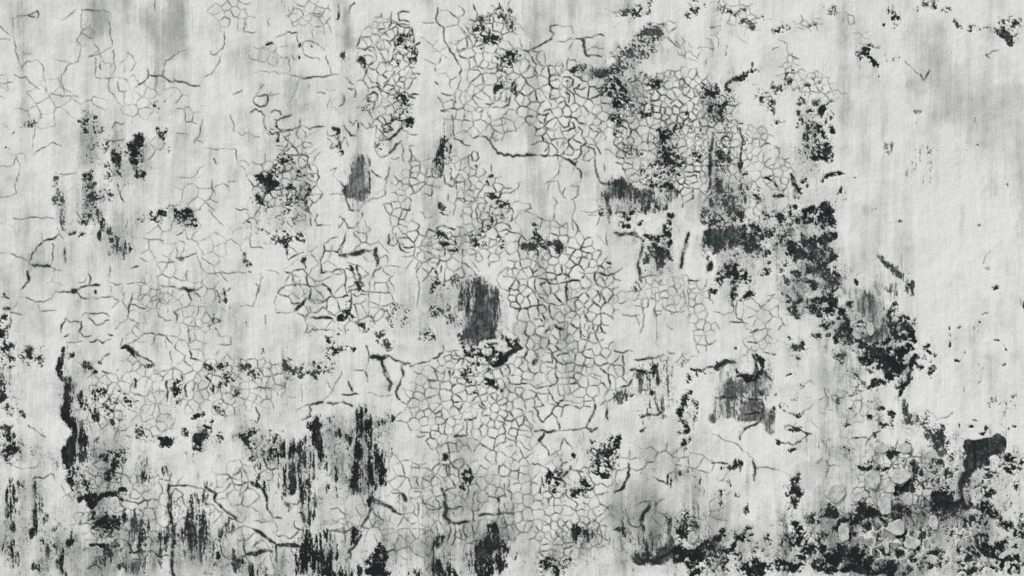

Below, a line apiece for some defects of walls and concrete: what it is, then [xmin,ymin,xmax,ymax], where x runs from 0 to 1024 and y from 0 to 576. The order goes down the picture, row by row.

peeling [472,9,521,97]
peeling [68,110,147,259]
peeling [138,205,198,228]
peeling [247,119,314,251]
damp [342,155,371,201]
peeling [569,0,794,307]
crack [3,0,797,576]
damp [417,268,504,349]
peeling [804,256,915,343]
crack [781,388,828,445]
peeling [831,350,1024,566]
peeling [166,482,215,563]